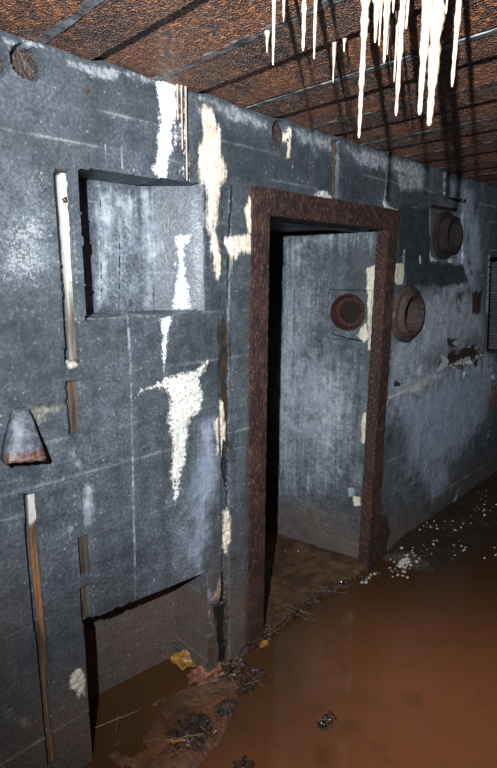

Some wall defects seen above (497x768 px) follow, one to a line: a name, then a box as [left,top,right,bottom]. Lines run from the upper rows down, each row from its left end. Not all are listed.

damp [152,81,185,178]
damp [161,104,251,364]
damp [135,360,209,501]
peeling [388,338,483,399]